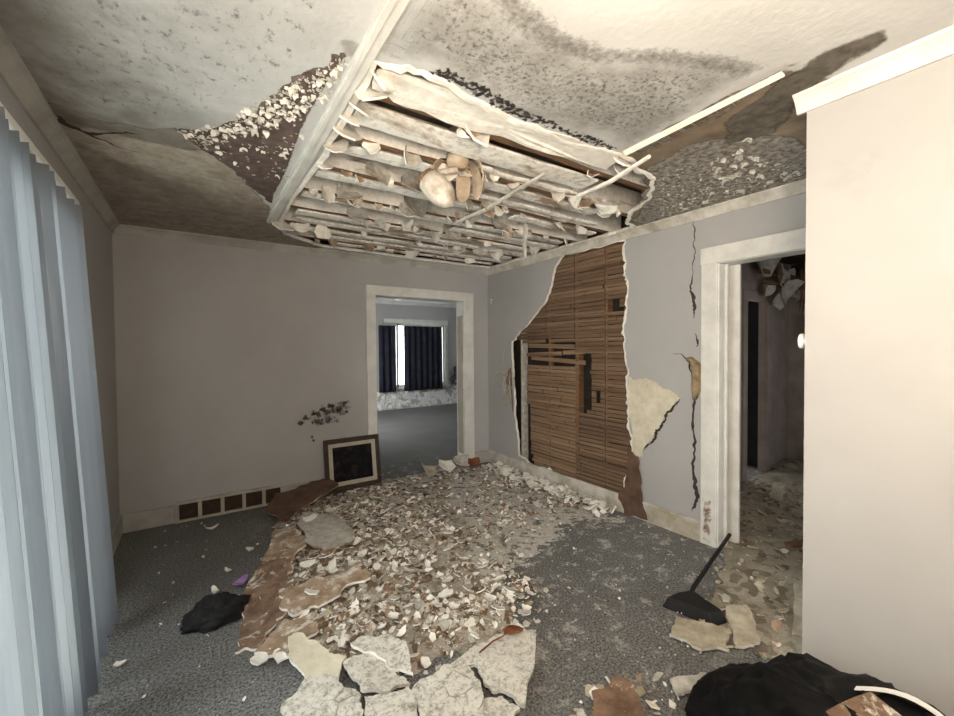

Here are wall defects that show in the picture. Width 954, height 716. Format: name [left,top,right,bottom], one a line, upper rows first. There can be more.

crack [56,114,136,152]
damp [49,104,320,249]
peeling [177,53,349,203]
flaking render [272,221,331,243]
flaking render [317,70,396,170]
flaking render [457,125,490,147]
mould [416,4,685,150]
flaking render [595,196,618,218]
peeling [630,135,806,225]
crack [678,225,699,377]
flaking render [511,217,680,520]
crack [691,400,700,510]